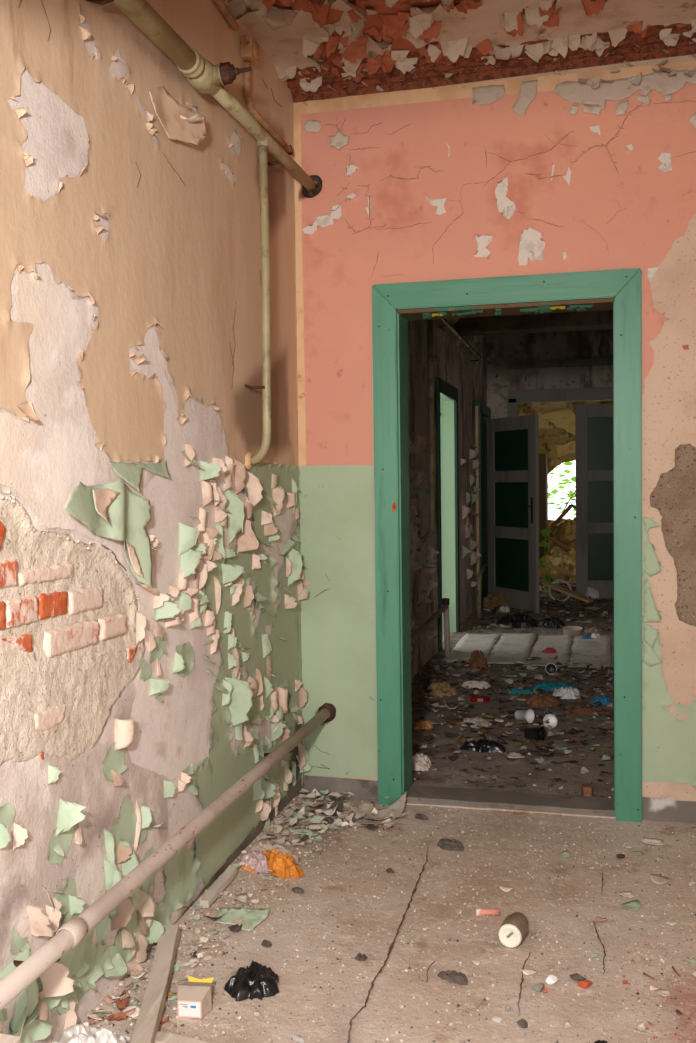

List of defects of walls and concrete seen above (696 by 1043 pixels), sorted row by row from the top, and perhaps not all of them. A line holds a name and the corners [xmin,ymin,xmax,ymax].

peeling [7,69,89,201]
peeling [79,11,207,146]
peeling [223,0,696,135]
peeling [495,177,516,219]
crack [327,101,694,277]
peeling [518,227,546,265]
peeling [461,444,482,587]
peeling [642,219,696,704]
peeling [0,798,86,981]
peeling [0,873,164,1036]
peeling [175,876,254,958]
crack [347,846,428,1043]